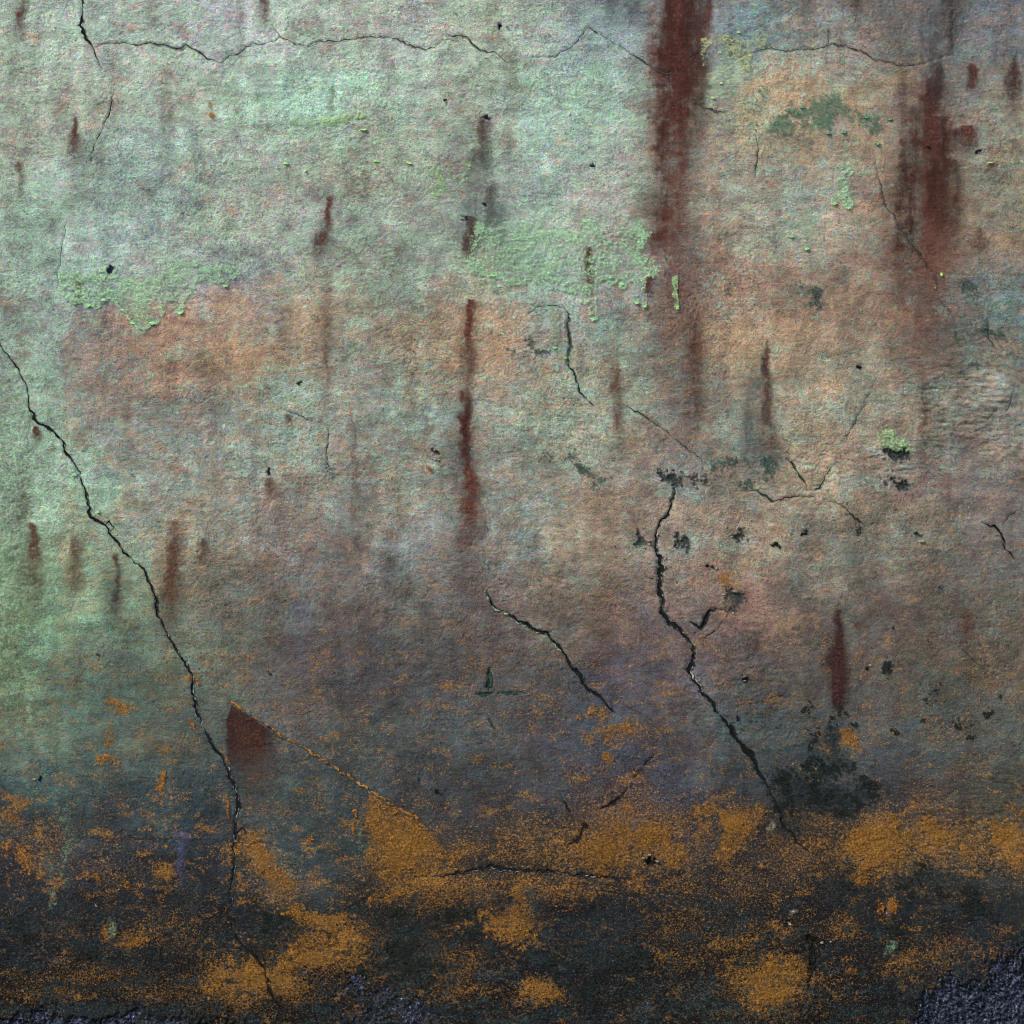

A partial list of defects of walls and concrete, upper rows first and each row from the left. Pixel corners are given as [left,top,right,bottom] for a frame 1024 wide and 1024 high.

crack [79,0,702,74]
peeling [56,258,241,331]
peeling [459,208,661,322]
rust [648,0,712,301]
rust [896,64,976,289]
rust [456,299,479,547]
crack [0,342,291,1017]
crack [425,590,680,882]
crack [647,480,812,854]
water stain [228,901,367,990]
water stain [352,794,466,908]
water stain [477,886,540,951]